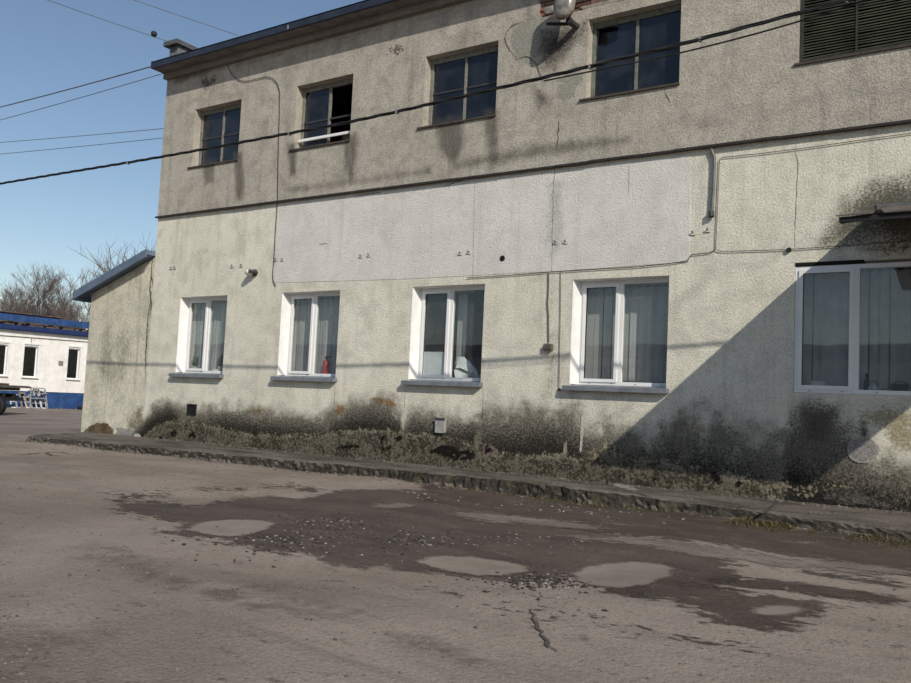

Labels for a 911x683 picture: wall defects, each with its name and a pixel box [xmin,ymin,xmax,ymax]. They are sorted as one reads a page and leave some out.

crack [504,21,543,83]
flaking render [511,0,554,64]
flaking render [574,0,624,12]
water stain [814,170,911,256]
crack [145,258,153,378]
water stain [129,394,911,512]